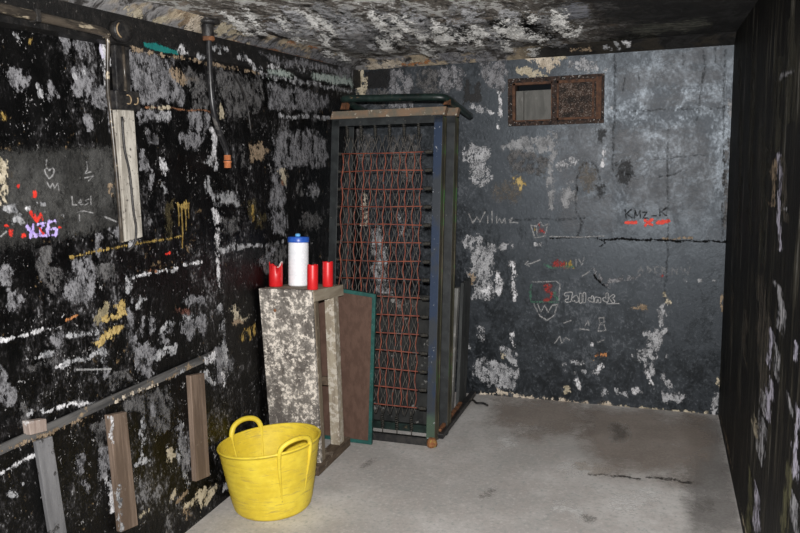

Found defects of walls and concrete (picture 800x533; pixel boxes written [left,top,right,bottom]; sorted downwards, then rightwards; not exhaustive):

crack [550,236,726,247]
crack [582,268,641,287]
crack [576,462,691,484]